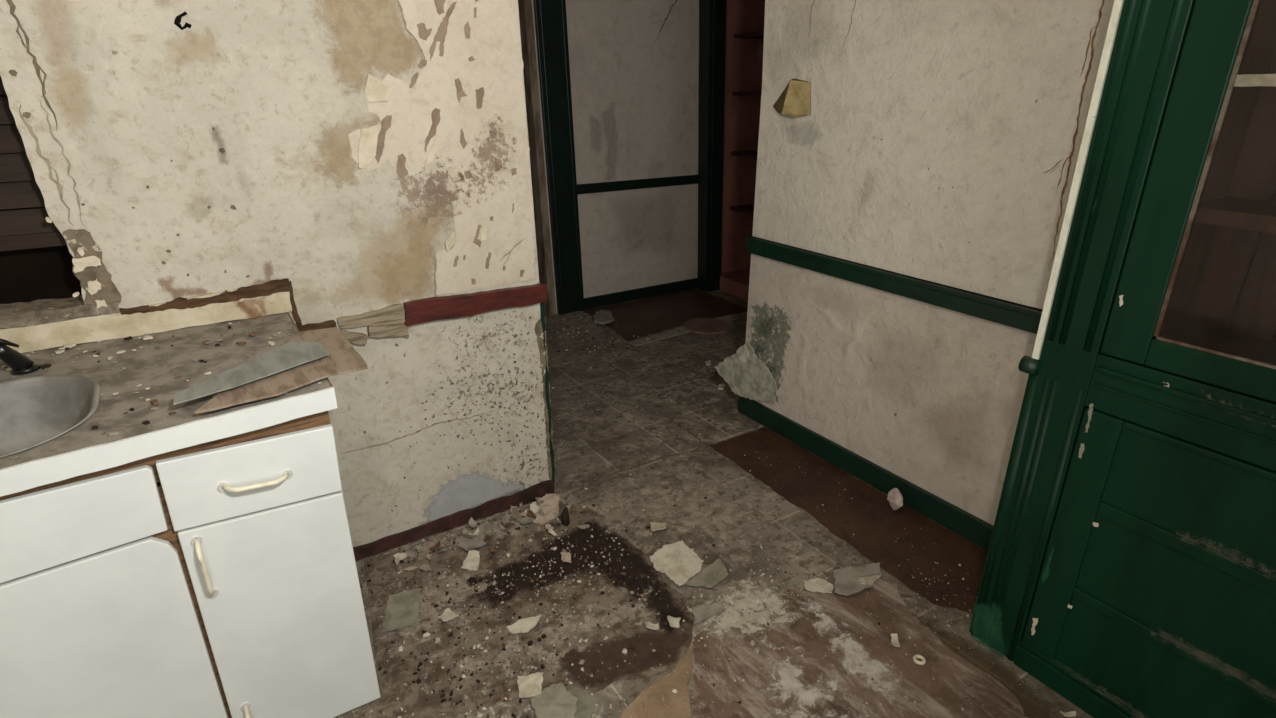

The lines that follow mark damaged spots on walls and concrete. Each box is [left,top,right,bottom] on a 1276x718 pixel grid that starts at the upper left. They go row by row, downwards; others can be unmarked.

crack [6,0,85,226]
flaking render [46,217,122,308]
water stain [320,126,354,180]
water stain [323,0,421,90]
peeling [348,0,535,295]
water stain [353,302,912,718]